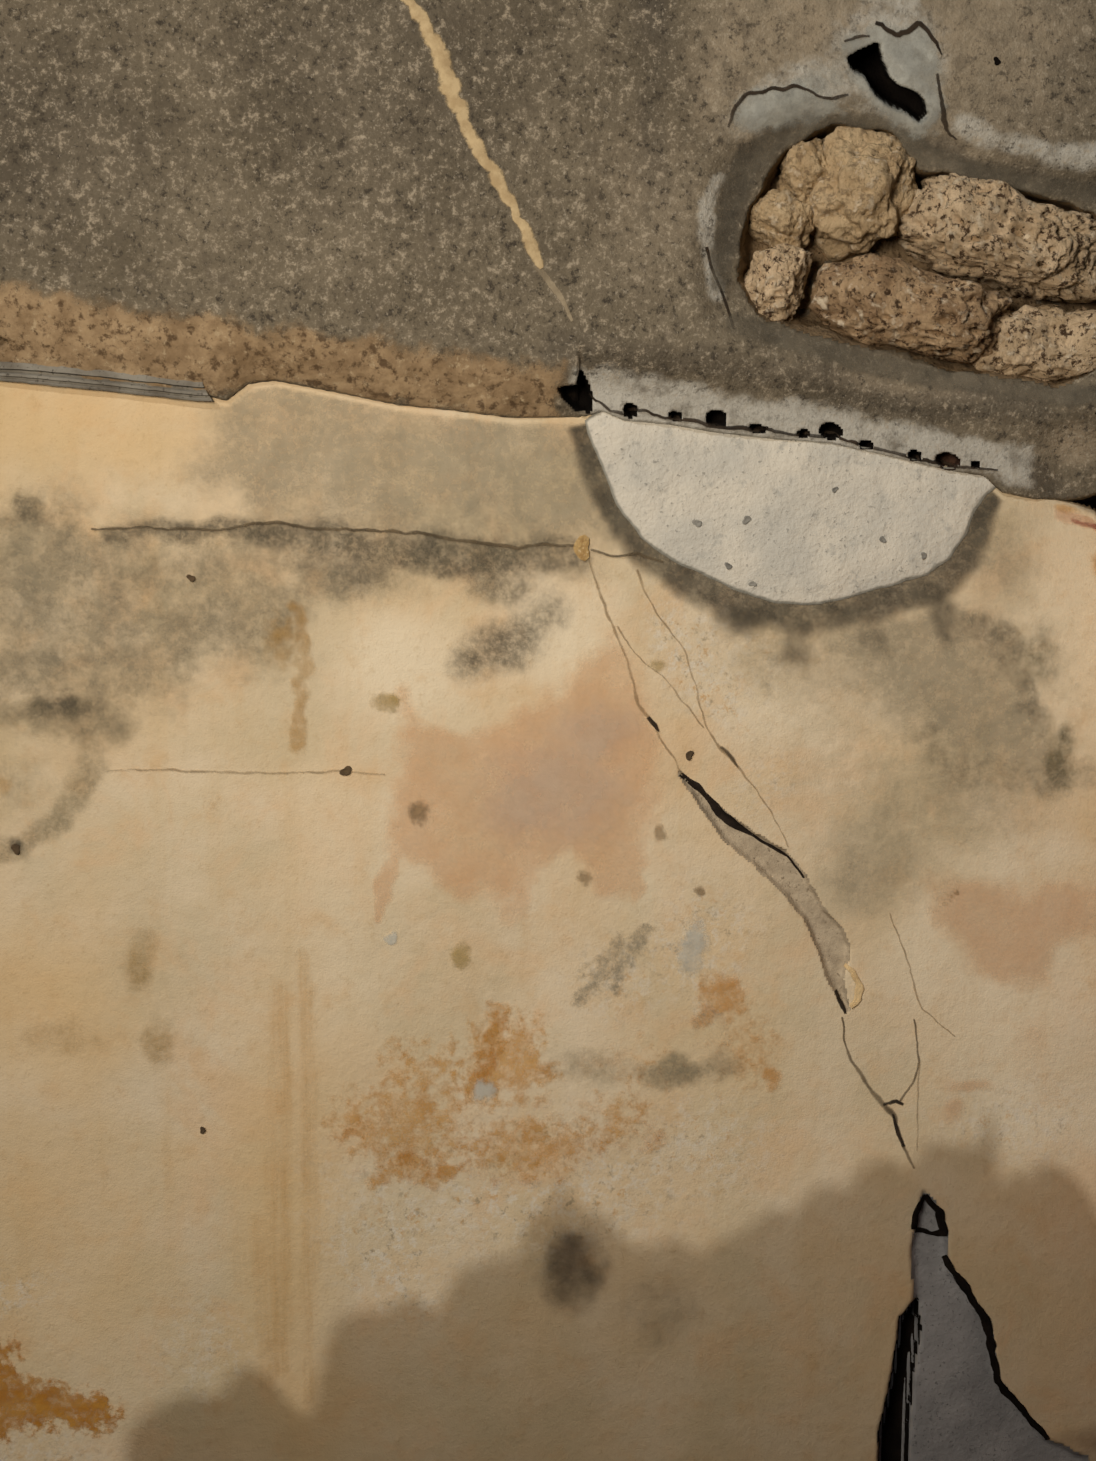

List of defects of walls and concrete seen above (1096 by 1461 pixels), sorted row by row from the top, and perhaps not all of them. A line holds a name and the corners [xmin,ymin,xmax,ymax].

crack [401,0,573,322]
flaking render [711,21,1096,405]
peeling [0,282,592,417]
damp [9,507,128,629]
crack [91,521,663,562]
crack [647,716,659,731]
crack [720,746,738,767]
crack [678,770,920,1153]